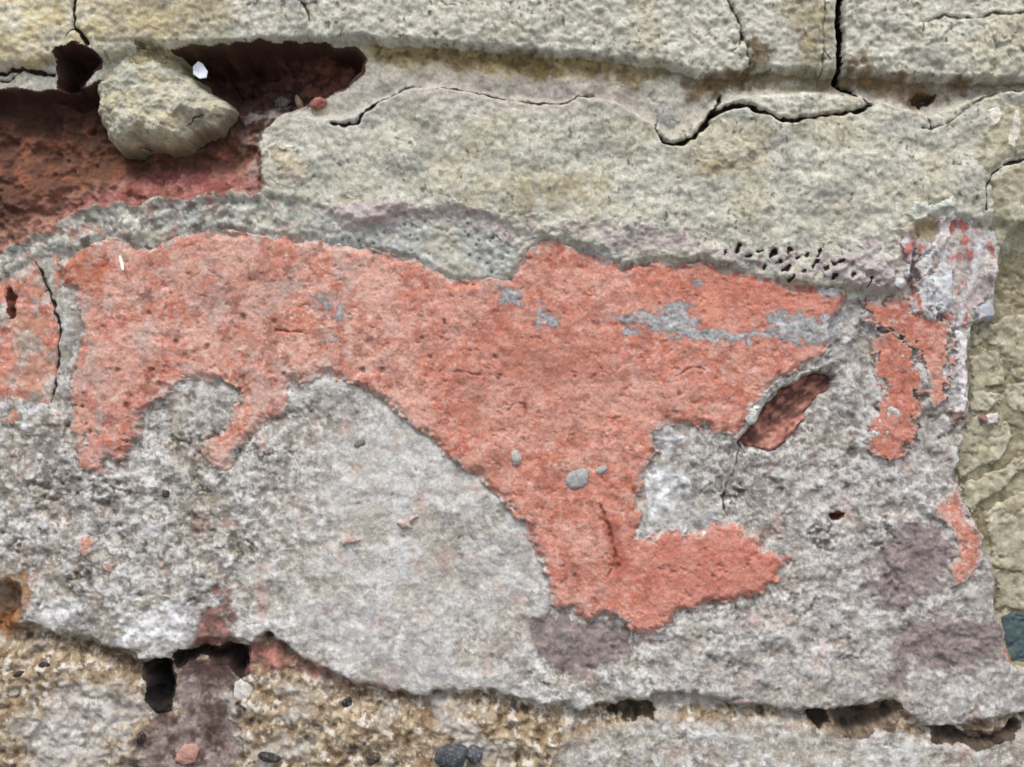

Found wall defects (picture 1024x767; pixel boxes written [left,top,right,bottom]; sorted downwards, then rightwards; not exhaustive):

peeling [193,61,208,79]
crack [727,0,751,66]
crack [816,0,832,88]
crack [330,85,595,128]
crack [655,94,872,146]
crack [985,158,1024,210]
crack [35,261,63,403]
spalling [0,165,1024,726]